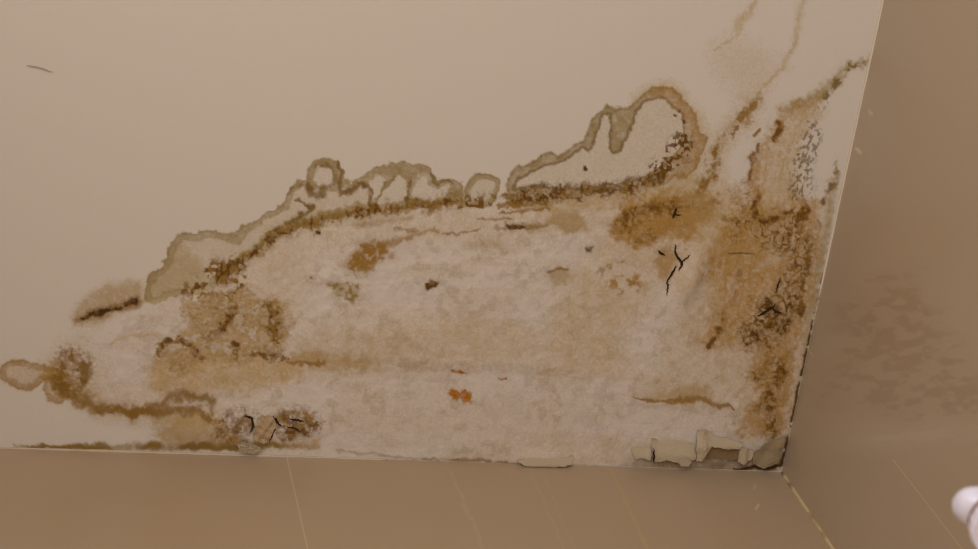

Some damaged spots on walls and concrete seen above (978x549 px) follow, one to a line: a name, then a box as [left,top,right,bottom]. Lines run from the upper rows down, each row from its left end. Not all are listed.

leakage [497,0,978,472]
crack [658,245,690,295]
leakage [0,155,552,456]
crack [757,278,782,316]
leakage [334,447,510,463]
peeling [631,438,696,467]